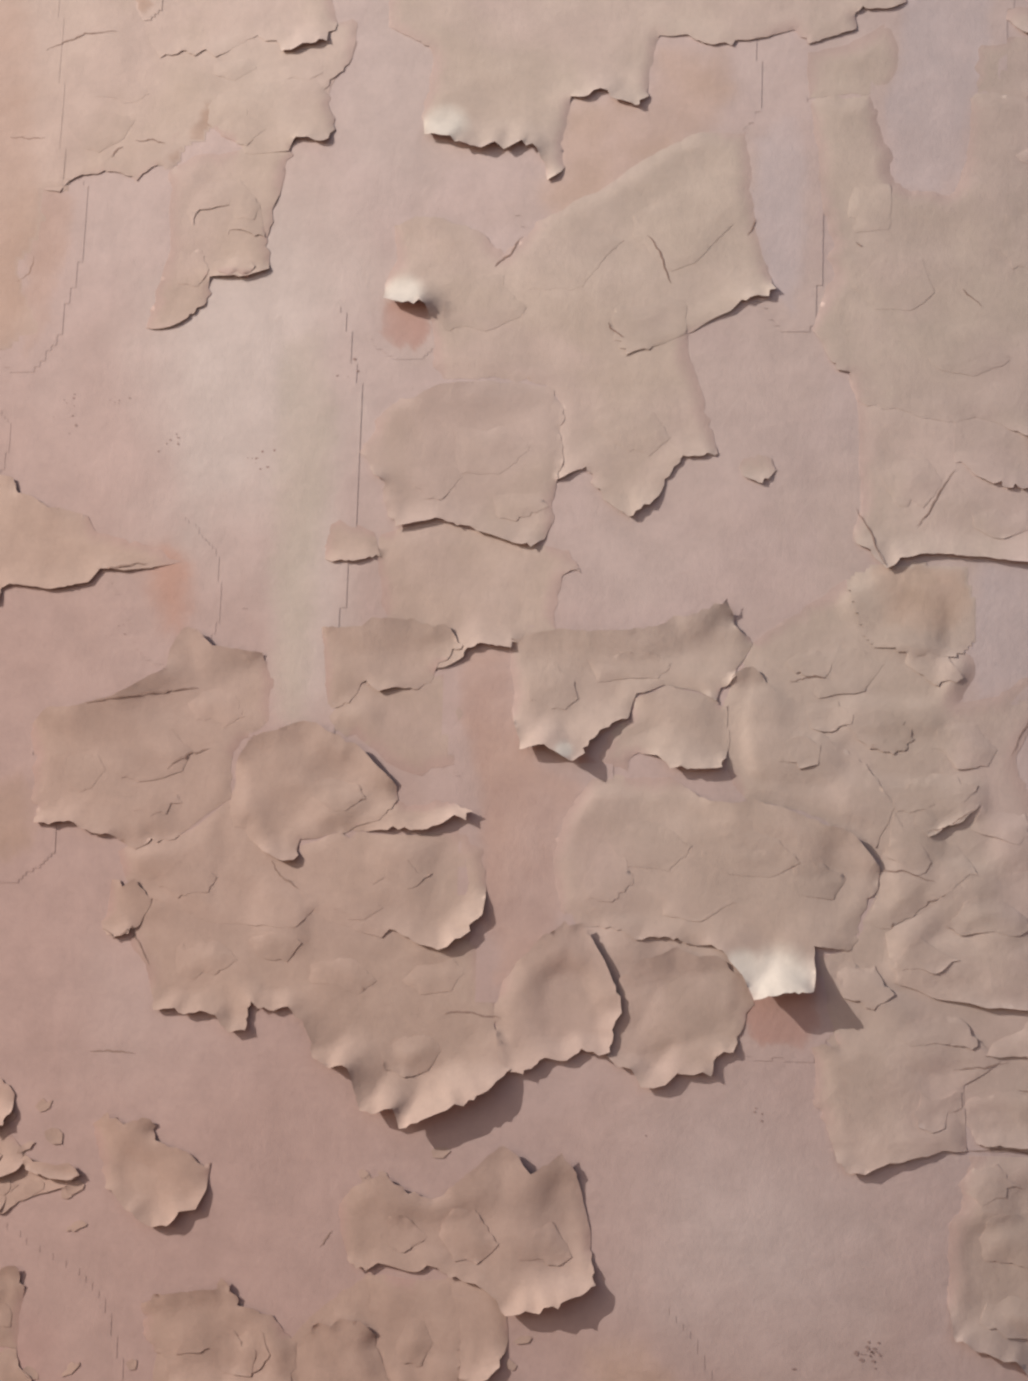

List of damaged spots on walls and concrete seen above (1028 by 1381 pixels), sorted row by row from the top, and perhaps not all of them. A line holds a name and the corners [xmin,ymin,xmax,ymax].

peeling [43,0,358,329]
peeling [389,0,906,180]
peeling [0,475,182,593]
peeling [30,93,1028,1175]
peeling [0,1078,84,1214]
peeling [0,1266,38,1381]
peeling [141,1146,596,1381]
peeling [947,1156,1028,1375]